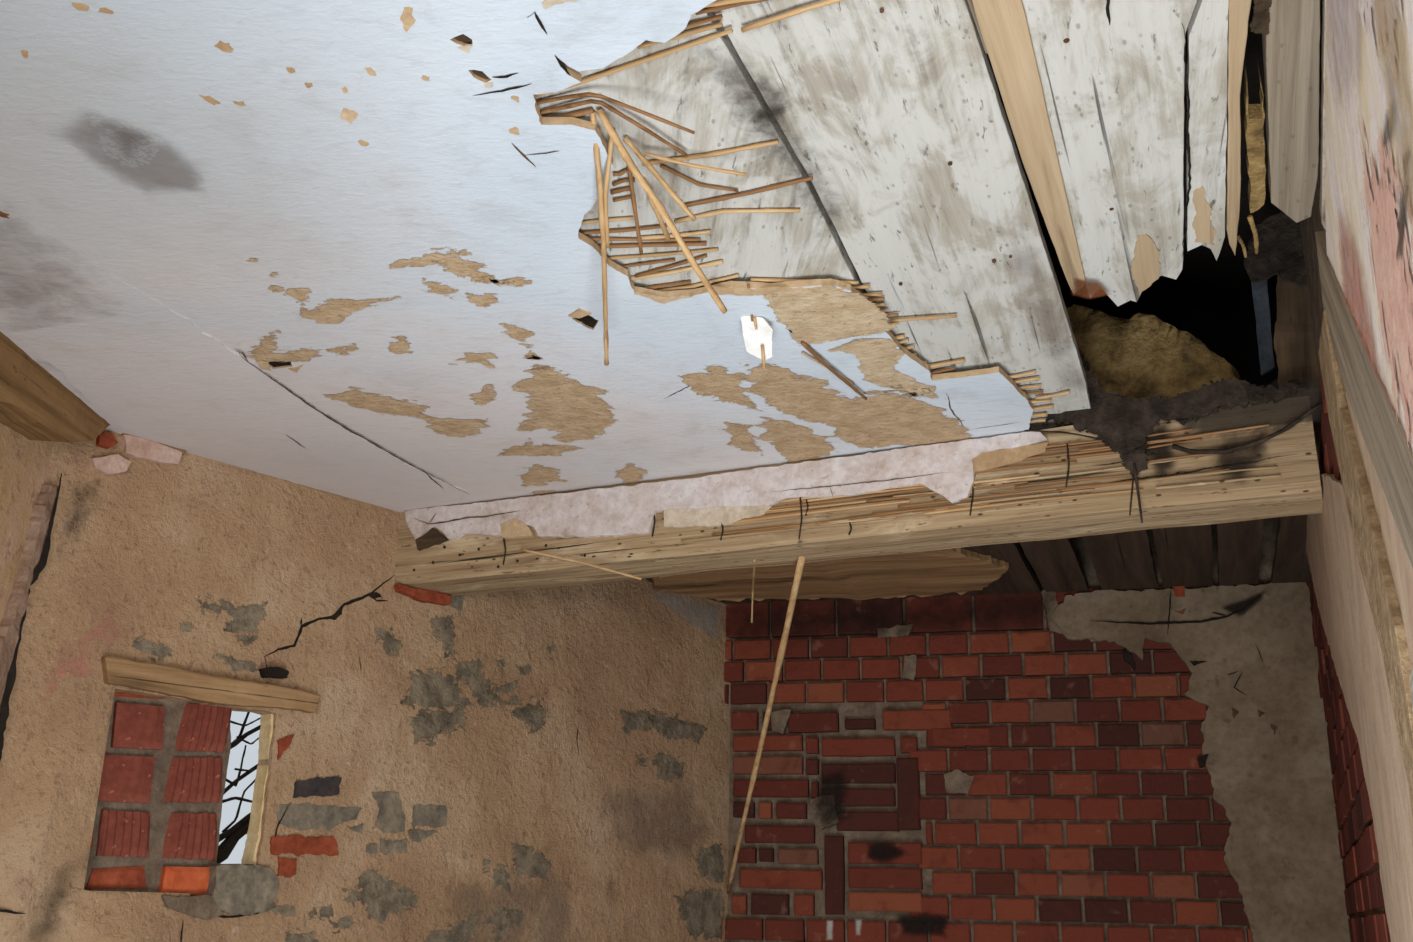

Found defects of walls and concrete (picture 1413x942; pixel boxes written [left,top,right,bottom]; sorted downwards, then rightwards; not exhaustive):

spalling [400,7,416,32]
spalling [340,86,358,124]
peeling [269,272,400,324]
peeling [389,247,532,307]
spalling [568,308,598,328]
peeling [246,330,360,373]
peeling [680,284,972,463]
peeling [324,323,618,495]
water stain [1185,385,1320,433]
spalling [179,593,289,679]
crack [264,575,394,669]
spalling [400,595,549,747]